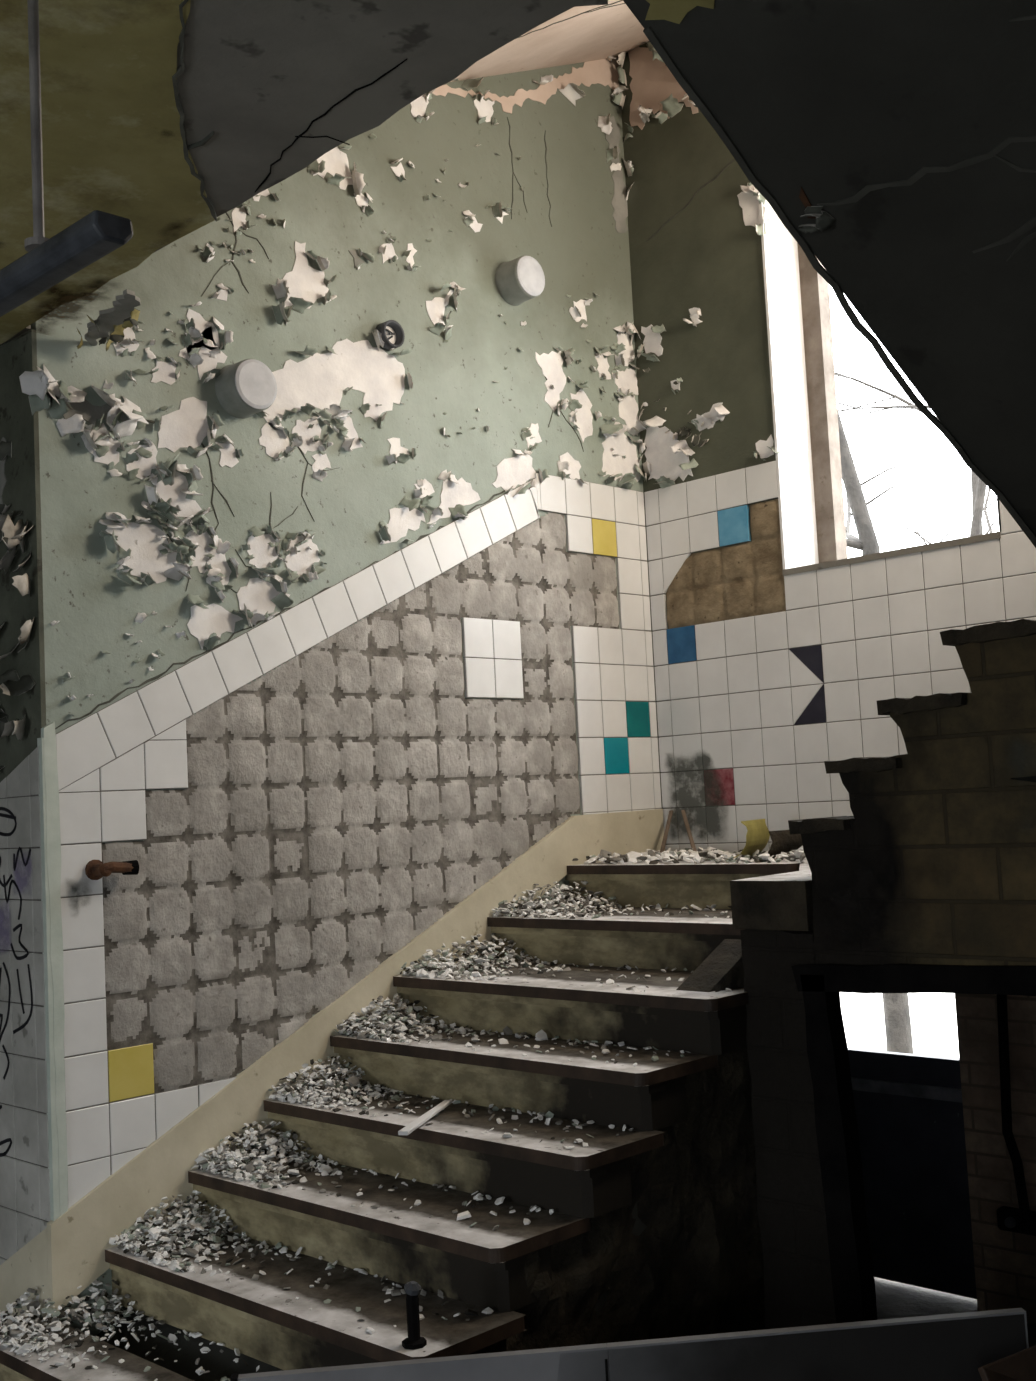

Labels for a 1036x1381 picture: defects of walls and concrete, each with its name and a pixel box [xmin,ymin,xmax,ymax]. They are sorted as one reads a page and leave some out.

crack [255,59,407,192]
peeling [307,145,374,217]
crack [817,136,1036,206]
damp [20,282,114,337]
peeling [0,0,338,684]
peeling [256,329,417,481]
peeling [348,231,432,271]
spalling [378,0,1036,547]
peeling [666,499,786,629]
peeling [0,618,60,741]